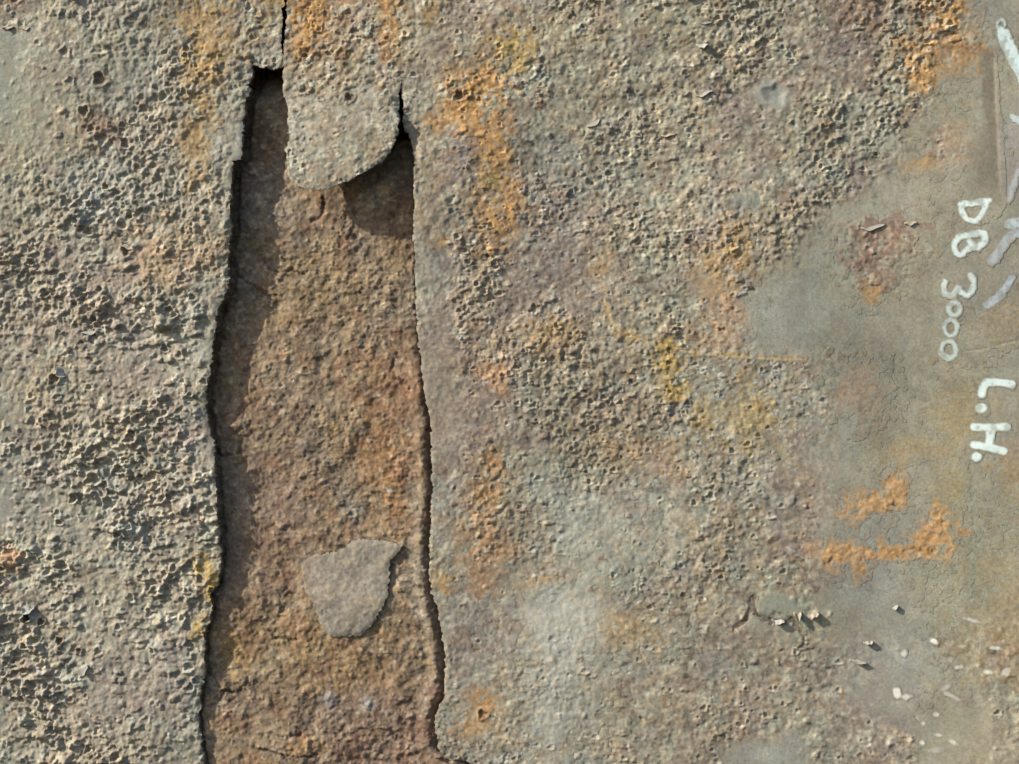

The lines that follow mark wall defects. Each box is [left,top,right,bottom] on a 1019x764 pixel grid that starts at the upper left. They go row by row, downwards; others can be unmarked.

crack [279,0,287,55]
corrosion [361,0,551,274]
corrosion [806,0,1012,316]
spalling [198,0,471,764]
corrosion [550,195,1019,709]